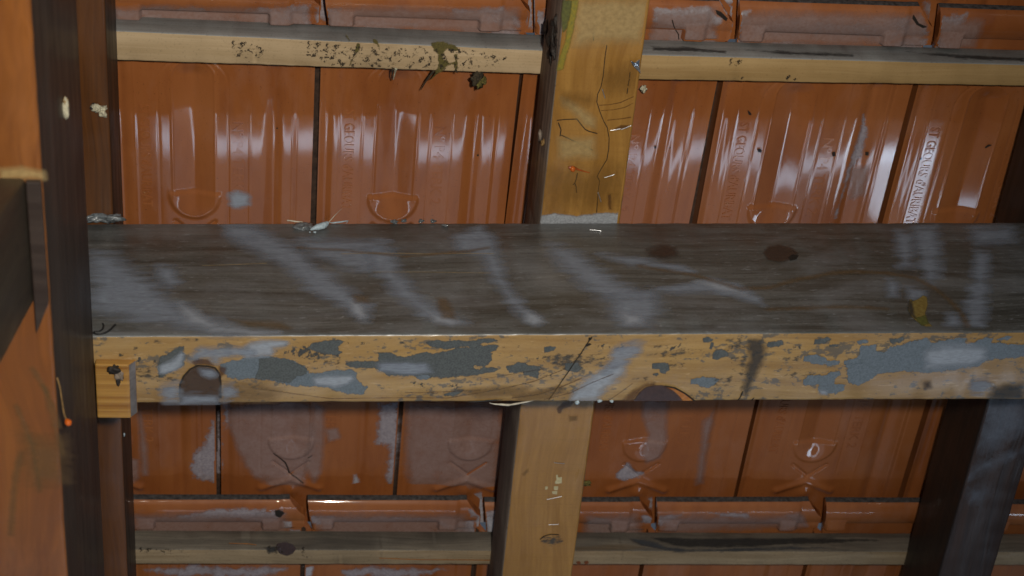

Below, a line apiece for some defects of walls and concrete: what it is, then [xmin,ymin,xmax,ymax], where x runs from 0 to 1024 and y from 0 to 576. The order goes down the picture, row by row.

damp [306,41,506,73]
crack [557,38,632,213]
damp [90,252,279,336]
damp [227,224,458,324]
damp [554,243,761,326]
peeling [135,338,640,401]
crack [456,337,630,401]
peeling [644,344,685,379]
peeling [703,337,744,360]
peeling [785,336,1024,395]
damp [190,402,339,485]
crack [273,453,313,483]